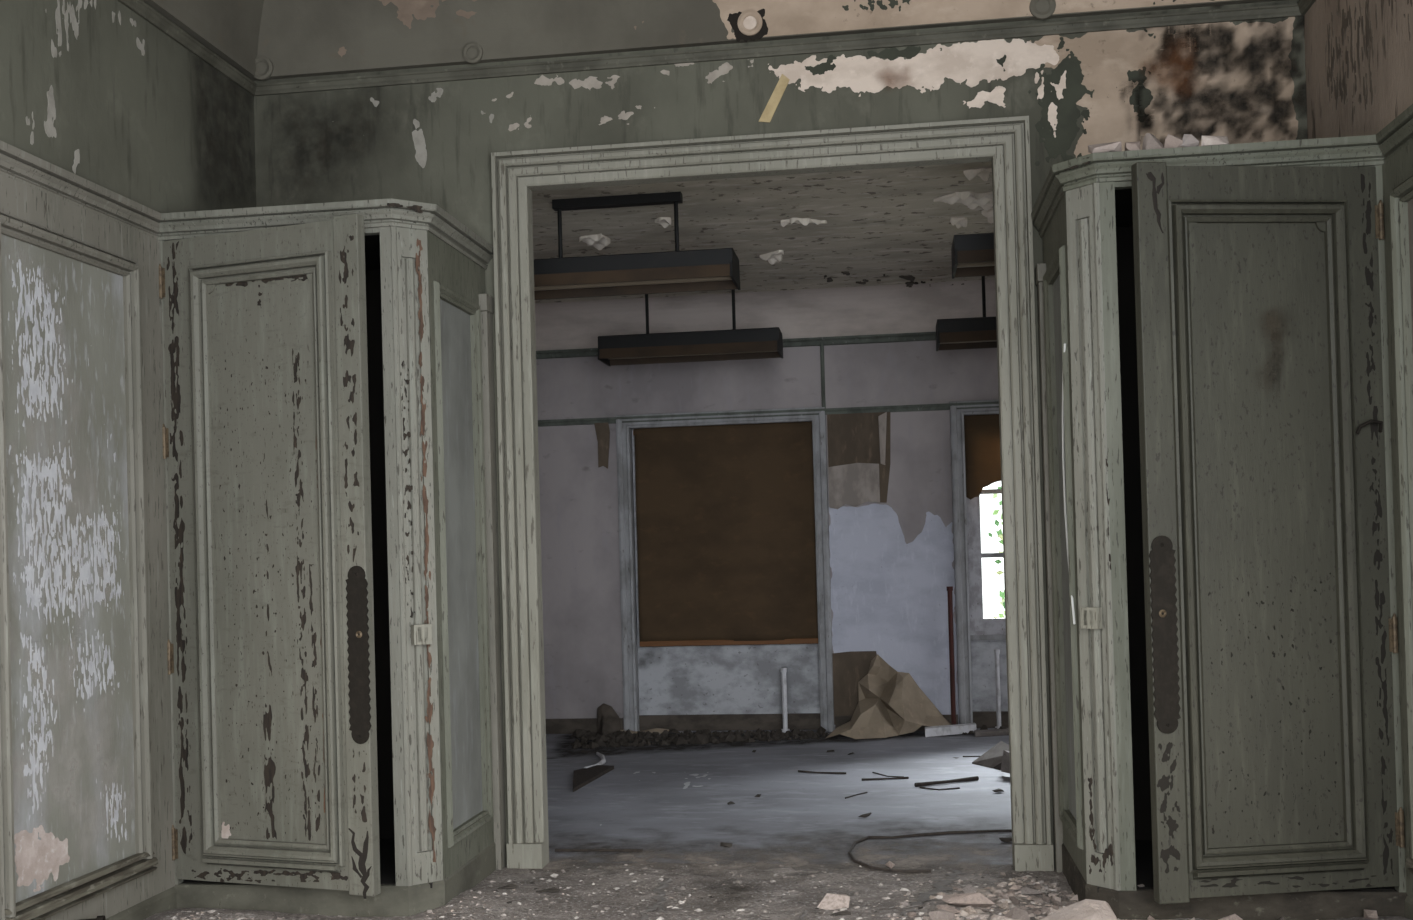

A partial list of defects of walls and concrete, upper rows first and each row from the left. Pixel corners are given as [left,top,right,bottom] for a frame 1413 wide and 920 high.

peeling [51,0,145,58]
flaking render [412,119,427,168]
flaking render [534,75,620,90]
flaking render [712,0,1033,42]
flaking render [705,17,1298,170]
flaking render [1053,0,1228,14]
damp [1132,16,1308,147]
peeling [8,255,73,427]
peeling [339,235,359,562]
peeling [9,442,127,892]
peeling [167,241,196,854]
peeling [217,348,325,841]